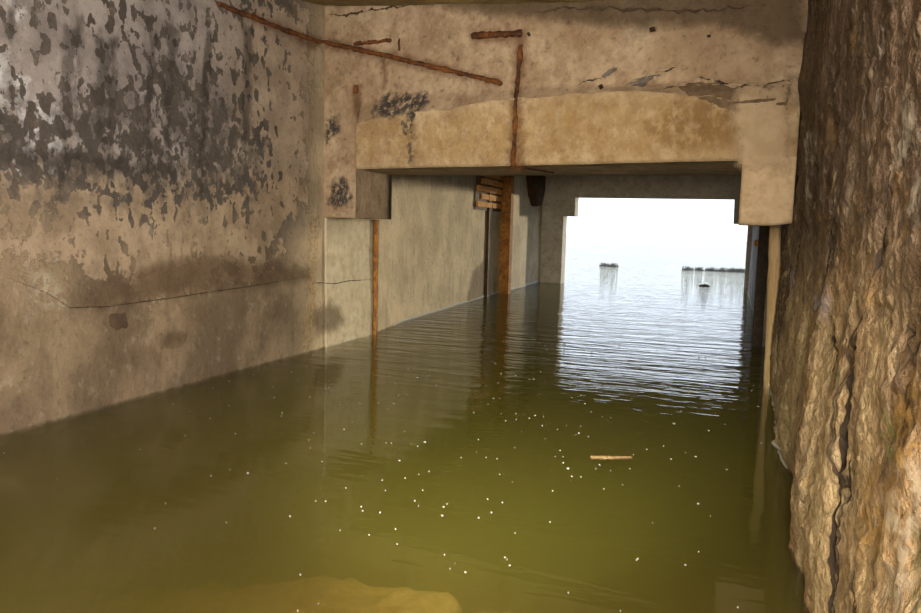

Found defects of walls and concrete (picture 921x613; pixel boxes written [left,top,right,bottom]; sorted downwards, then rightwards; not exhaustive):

peeling [0,0,317,311]
crack [872,171,891,276]
spalling [109,302,128,330]
crack [895,317,921,450]
crack [826,316,863,613]